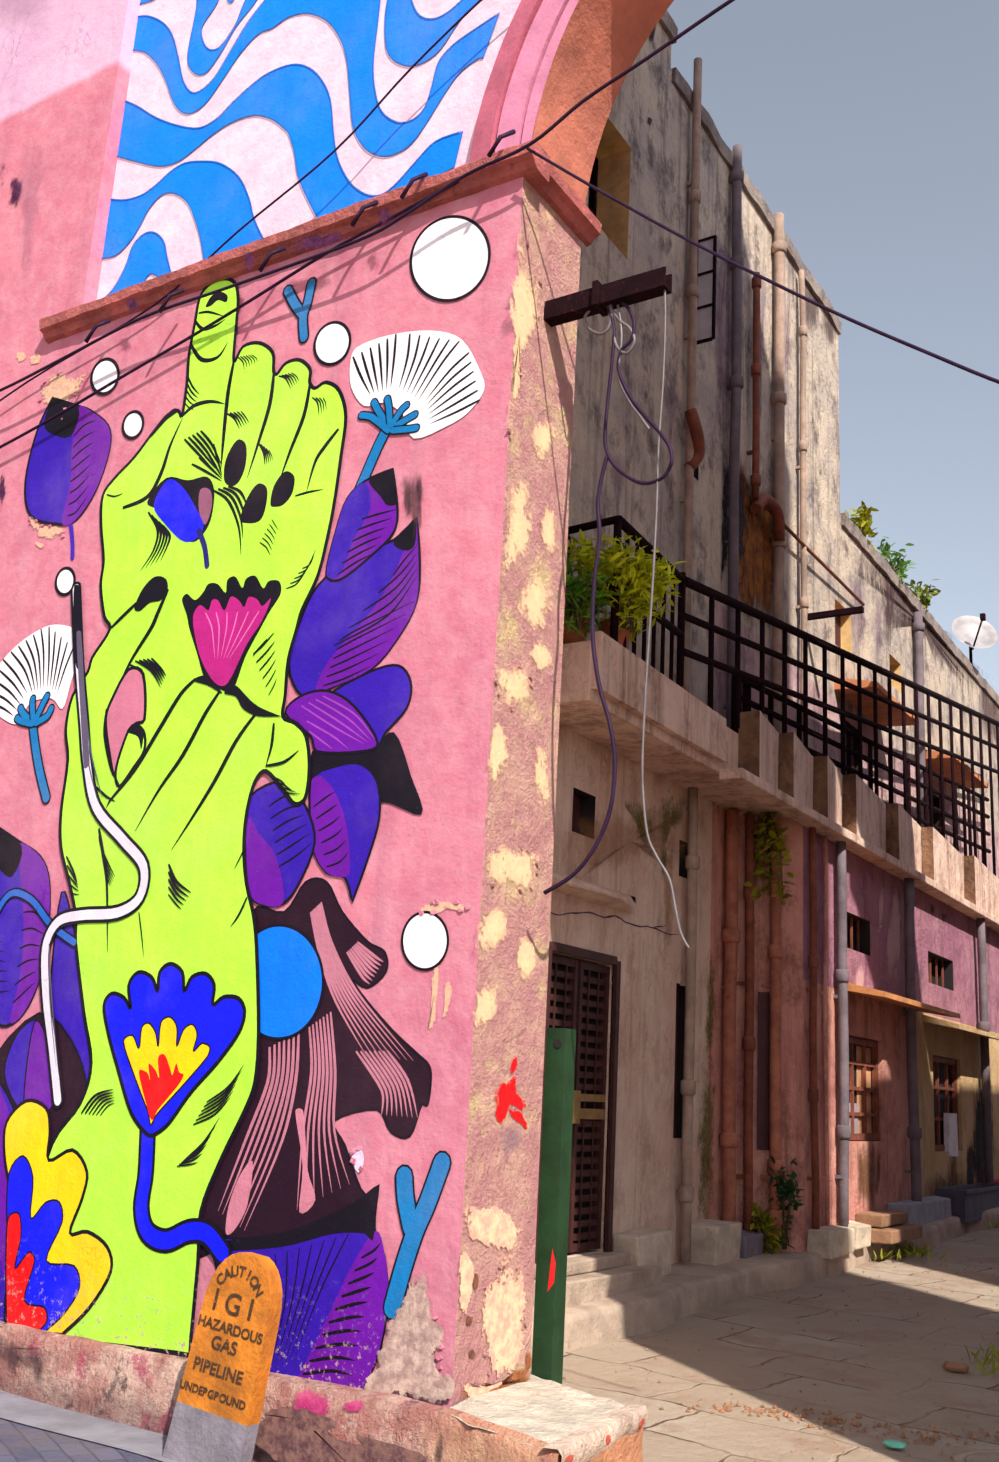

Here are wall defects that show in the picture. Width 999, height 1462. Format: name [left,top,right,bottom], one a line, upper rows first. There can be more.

mould [2,166,22,204]
peeling [508,238,543,404]
peeling [531,422,557,459]
peeling [503,482,555,568]
corrosion [738,471,773,612]
peeling [489,574,552,780]
peeling [534,747,549,803]
peeling [488,844,540,893]
peeling [419,899,536,979]
peeling [428,966,452,1033]
peeling [474,985,497,1026]
peeling [364,1202,530,1404]